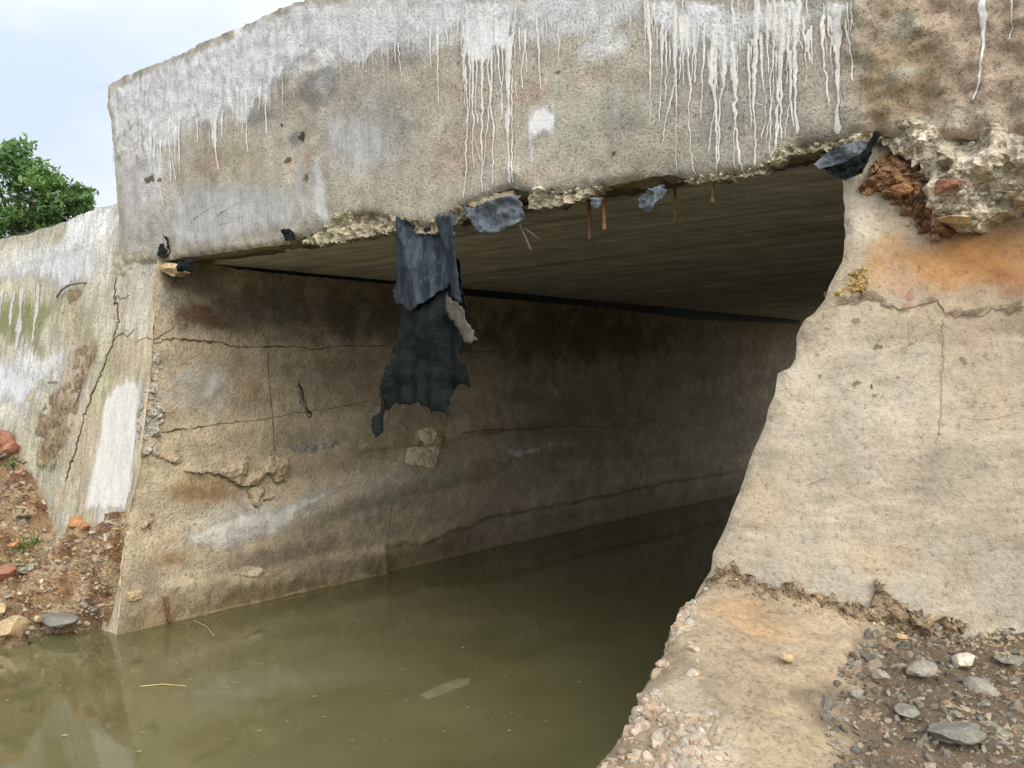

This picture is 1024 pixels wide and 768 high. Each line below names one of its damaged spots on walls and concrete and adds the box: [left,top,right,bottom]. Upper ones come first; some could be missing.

efflorescence [110,0,855,205]
efflorescence [314,166,329,221]
spalling [300,209,439,248]
spalling [449,185,613,240]
spalling [673,131,886,223]
crack [65,277,394,481]
peeling [136,350,291,508]
peeling [405,428,443,468]
spalling [704,559,967,637]